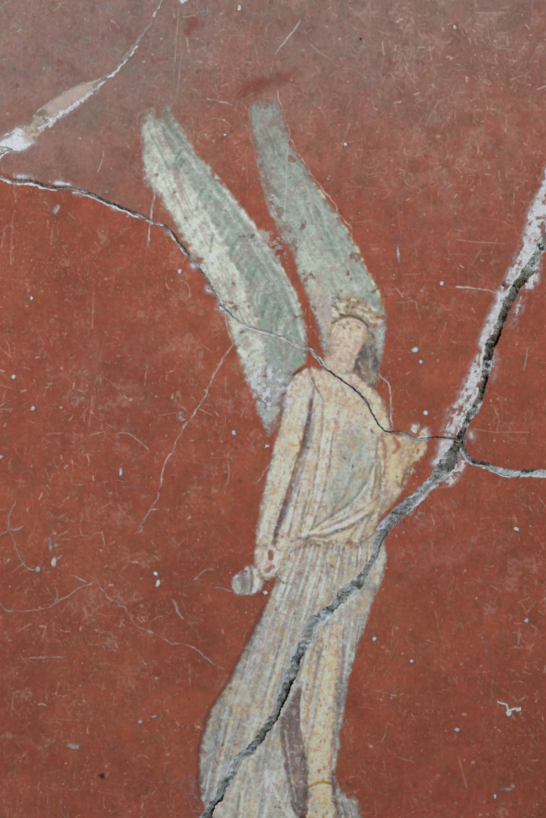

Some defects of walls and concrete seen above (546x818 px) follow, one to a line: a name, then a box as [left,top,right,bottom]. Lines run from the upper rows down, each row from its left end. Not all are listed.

crack [0,0,162,159]
crack [277,89,353,229]
crack [0,170,546,818]